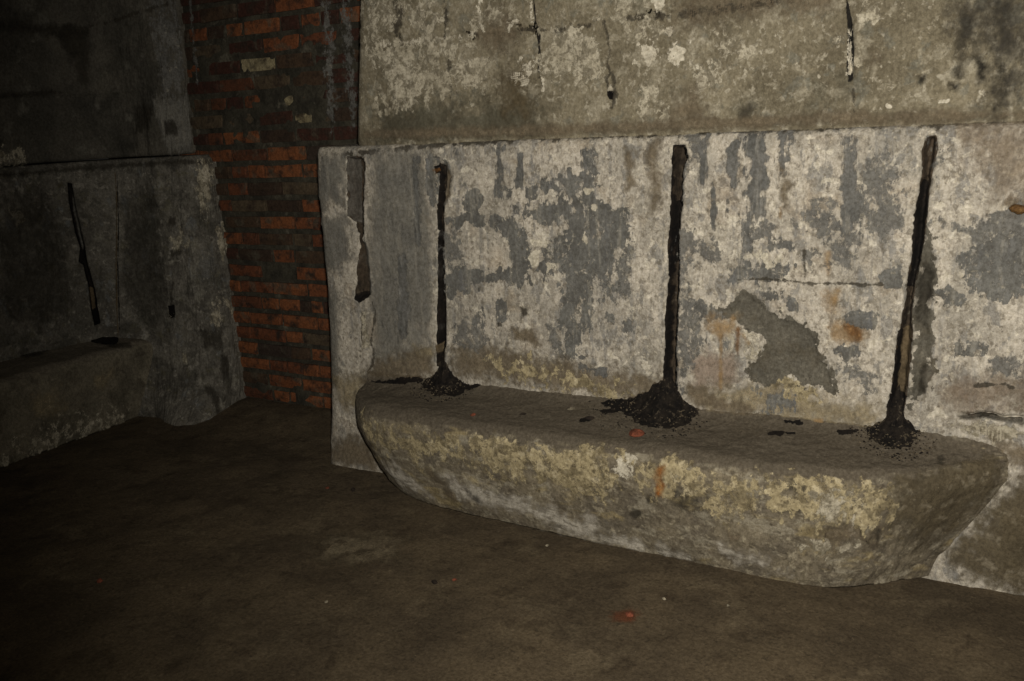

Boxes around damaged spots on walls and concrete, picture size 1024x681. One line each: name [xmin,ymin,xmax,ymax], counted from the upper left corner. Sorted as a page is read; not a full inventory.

crack [520,0,793,108]
crack [846,1,863,102]
leakage [319,0,1024,594]
corrosion [831,324,863,341]